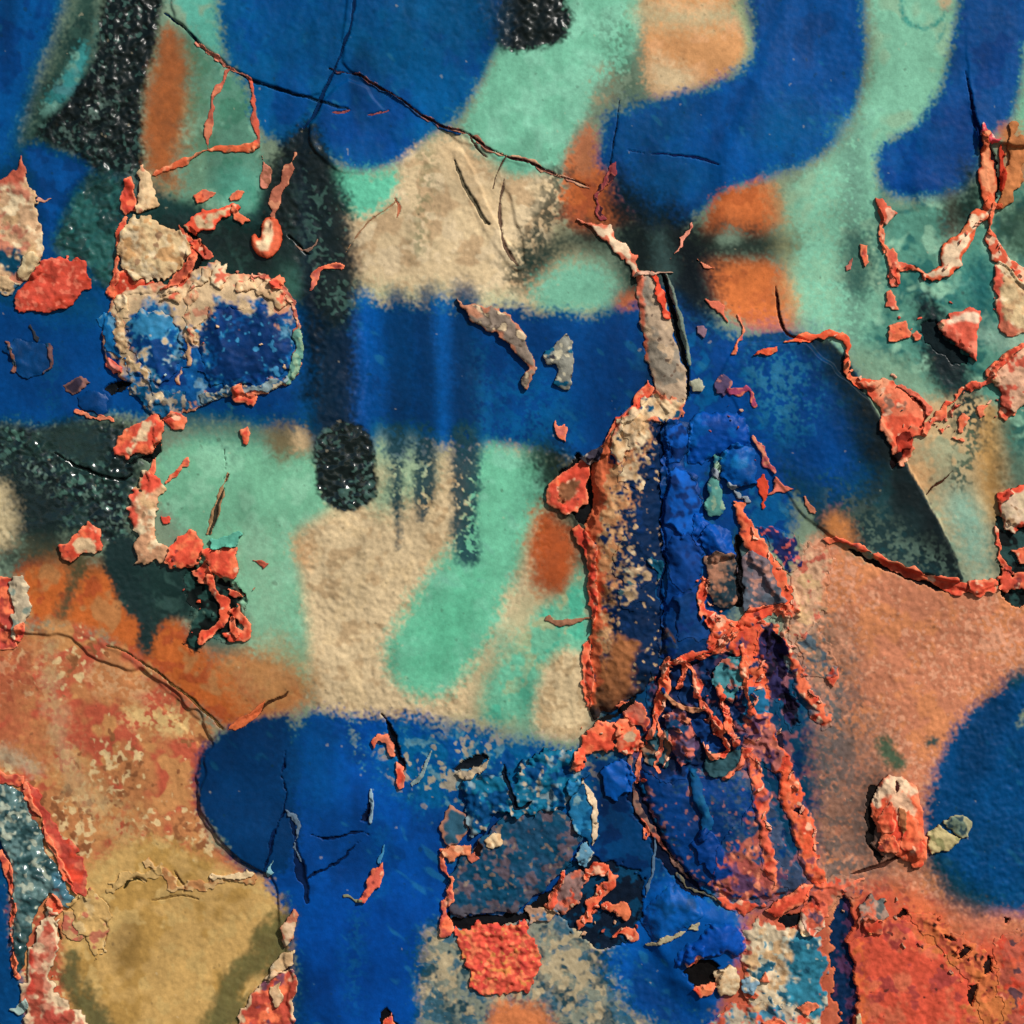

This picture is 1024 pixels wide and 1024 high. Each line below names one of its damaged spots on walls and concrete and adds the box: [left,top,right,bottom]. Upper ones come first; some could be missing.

flaking render [0,156,92,379]
peeling [58,152,304,653]
crack [153,0,719,444]
peeling [457,299,574,390]
peeling [705,299,745,355]
peeling [755,121,1024,469]
peeling [0,770,274,1024]
crack [106,645,288,731]
peeling [237,909,299,1024]
crack [263,753,369,904]
peeling [371,714,432,789]
peeling [439,374,1024,1024]